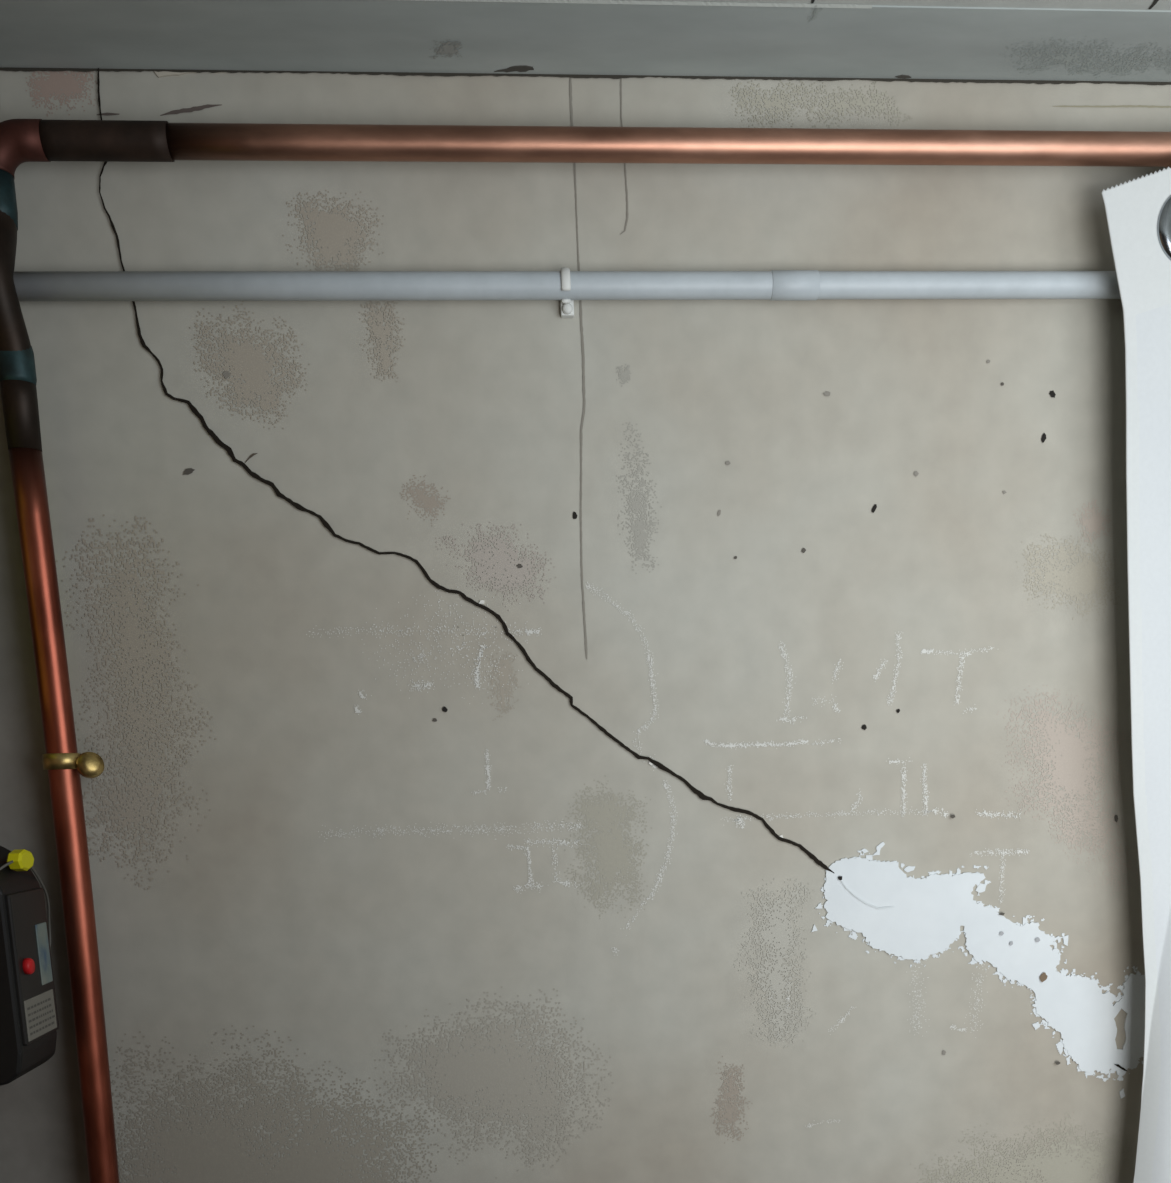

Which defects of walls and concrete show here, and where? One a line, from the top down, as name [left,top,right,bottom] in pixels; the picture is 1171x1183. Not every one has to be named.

crack [99,162,125,271]
crack [573,163,581,271]
crack [620,163,628,235]
crack [132,300,891,909]